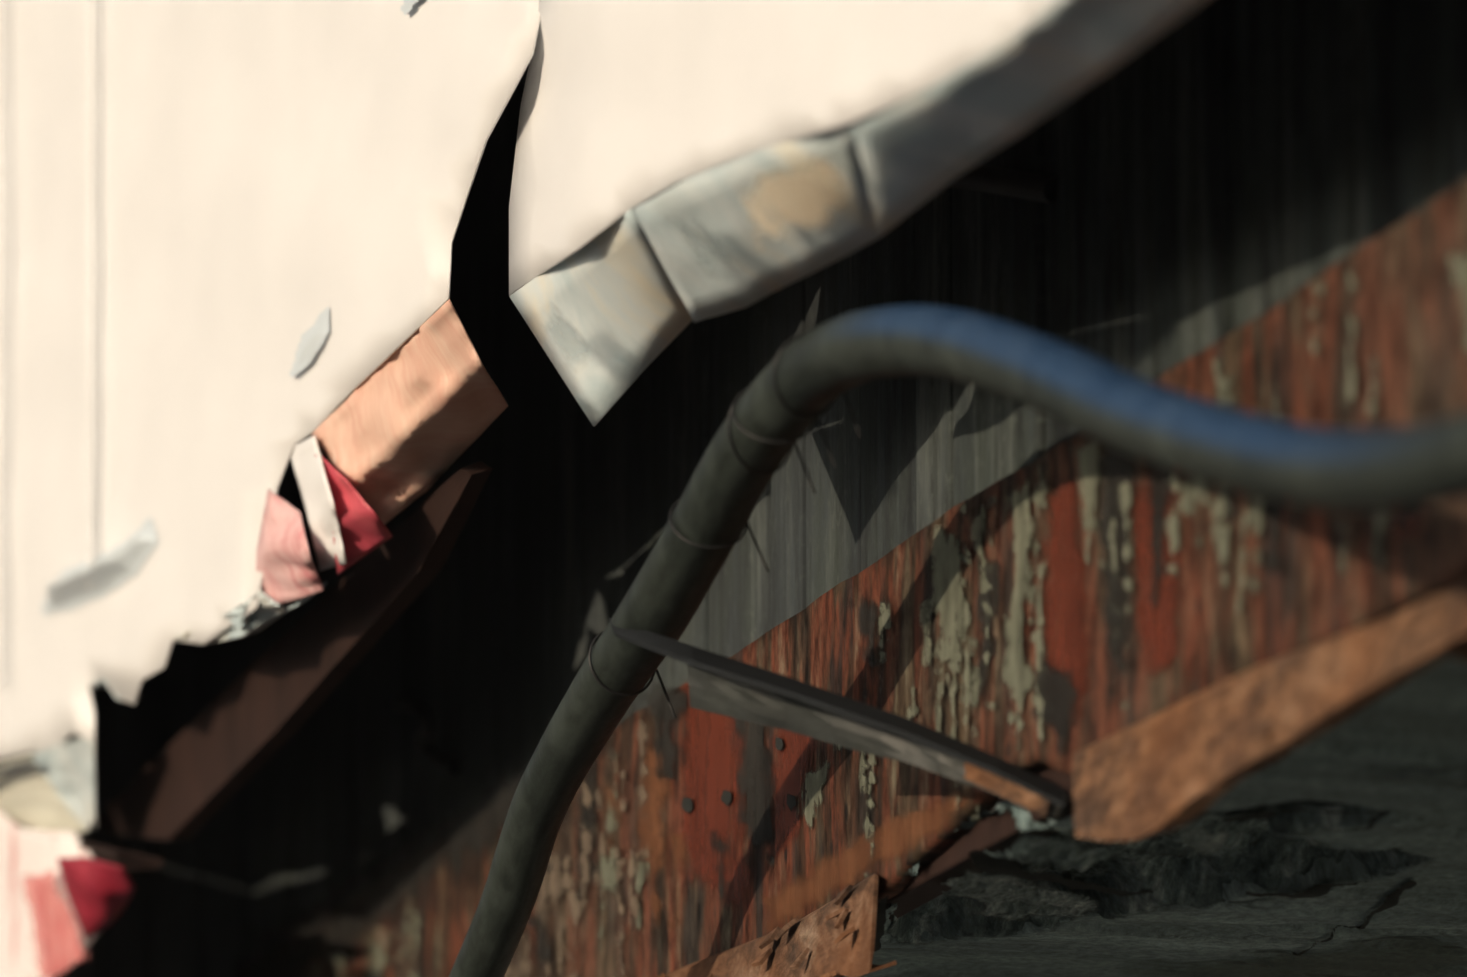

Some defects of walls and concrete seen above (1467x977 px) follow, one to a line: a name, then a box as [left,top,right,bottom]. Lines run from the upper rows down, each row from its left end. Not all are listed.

peeling [878,602,892,663]
peeling [907,463,1048,748]
peeling [1071,439,1134,614]
peeling [1165,474,1265,612]
peeling [859,752,876,878]
spalling [874,783,1421,951]
crack [1292,880,1417,956]